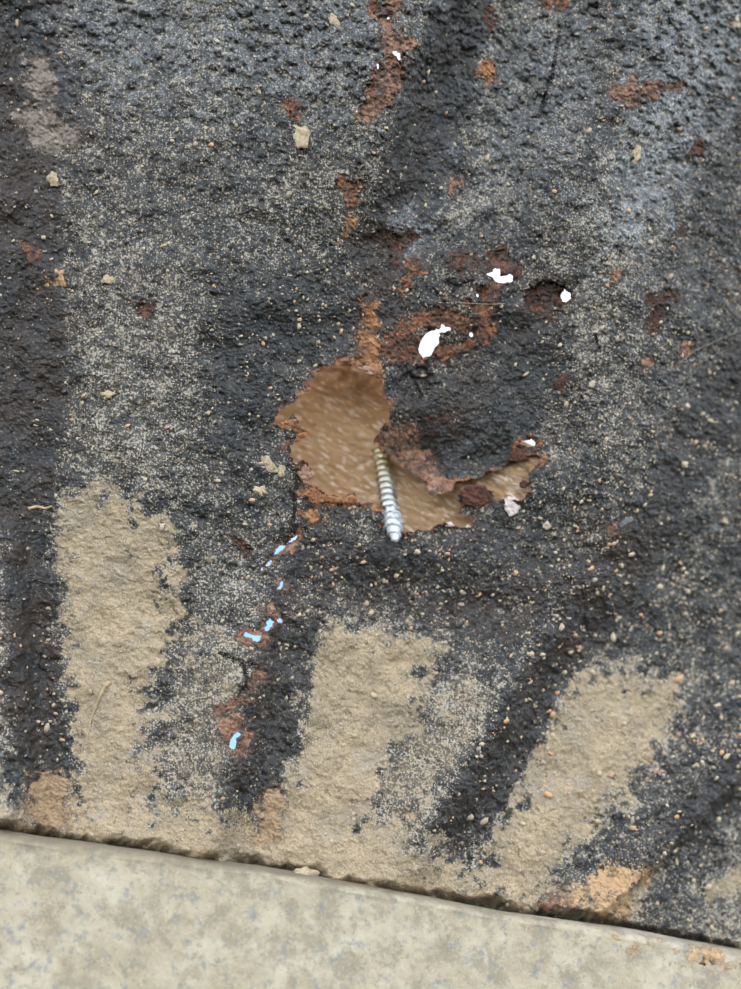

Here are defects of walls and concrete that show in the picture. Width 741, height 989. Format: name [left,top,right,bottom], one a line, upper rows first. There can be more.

spalling [523,278,568,323]
peeling [358,365,377,375]
peeling [296,459,357,505]
water stain [25,769,77,839]
water stain [250,782,293,848]